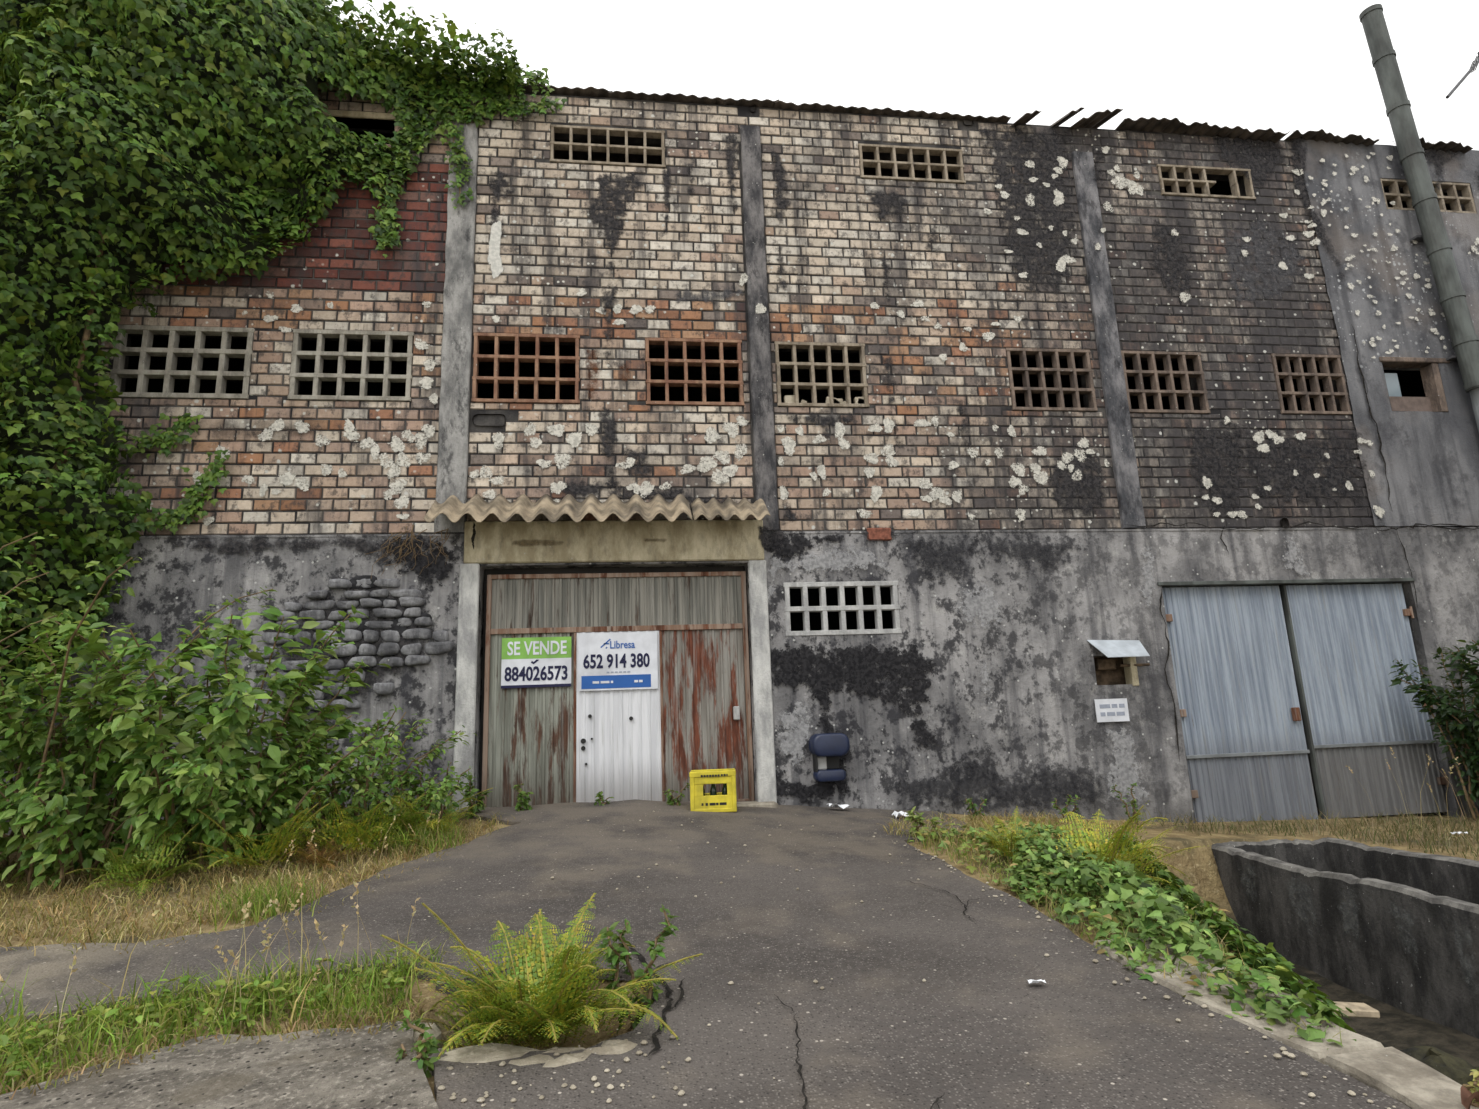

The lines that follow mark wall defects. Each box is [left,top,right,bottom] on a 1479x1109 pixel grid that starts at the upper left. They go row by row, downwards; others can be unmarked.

leakage [662,158,695,232]
leakage [723,133,740,209]
leakage [980,126,1077,308]
leakage [587,172,643,360]
leakage [1149,220,1192,302]
leakage [175,533,460,591]
mould [894,533,1090,582]
spalling [255,575,454,710]
mould [771,643,938,750]
mould [776,751,851,803]
leakage [886,728,1149,813]